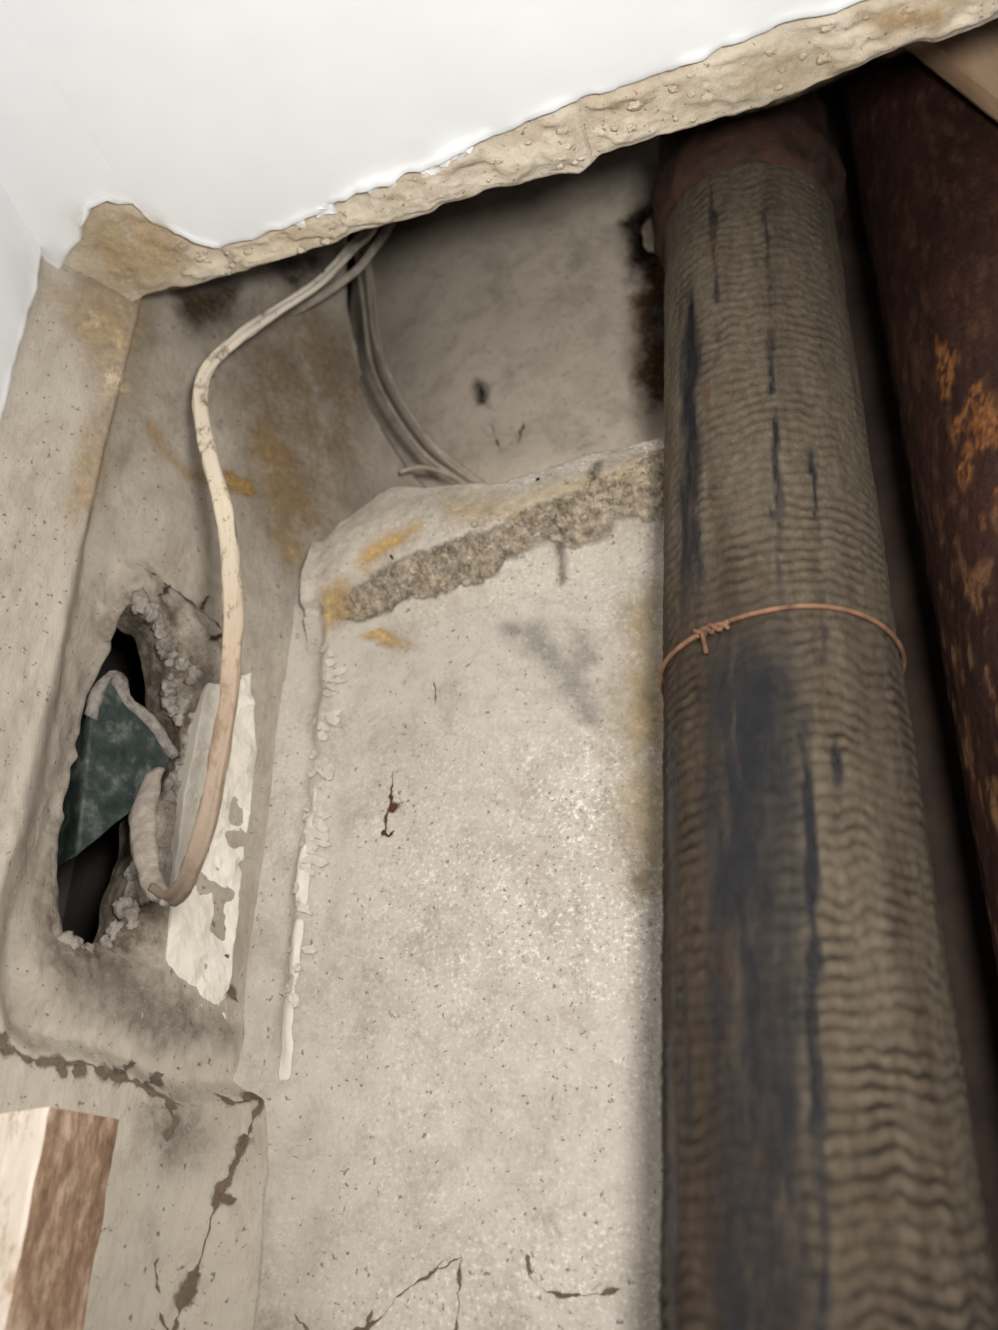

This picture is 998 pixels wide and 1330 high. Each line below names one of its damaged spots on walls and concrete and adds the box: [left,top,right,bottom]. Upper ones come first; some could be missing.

spalling [76,0,998,402]
spalling [345,449,664,621]
flaking render [88,587,220,886]
spalling [57,812,151,953]
flaking render [166,673,257,1019]
crack [0,1032,181,1142]
crack [154,1092,264,1330]
crack [353,1257,462,1330]
crack [524,1254,623,1298]